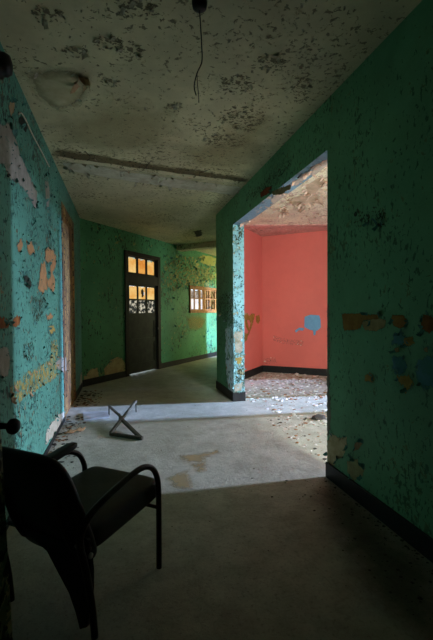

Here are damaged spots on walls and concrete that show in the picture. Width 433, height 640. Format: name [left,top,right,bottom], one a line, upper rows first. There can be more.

spalling [0,93,70,450]
peeling [232,160,327,275]
spalling [80,357,125,385]
peeling [198,286,246,393]
spalling [295,305,365,481]
peeling [342,311,433,354]